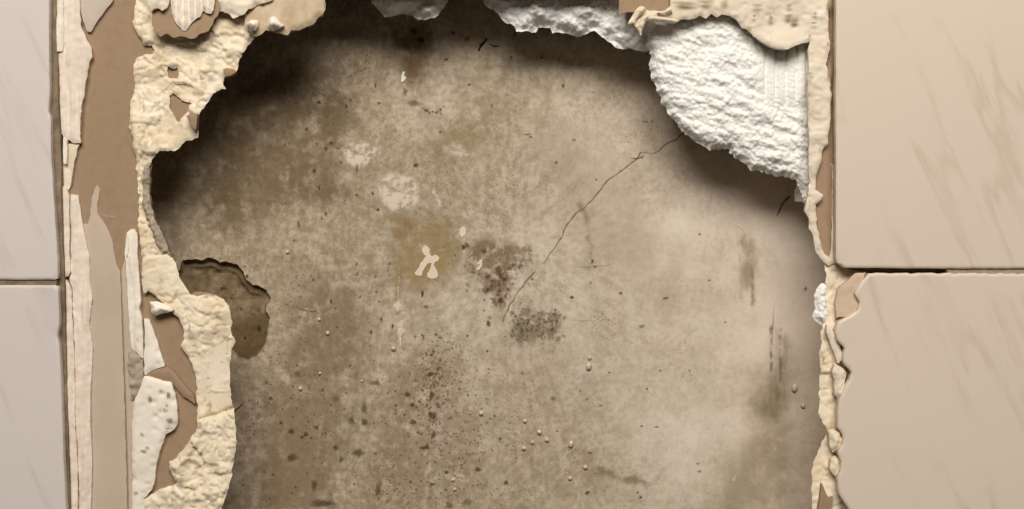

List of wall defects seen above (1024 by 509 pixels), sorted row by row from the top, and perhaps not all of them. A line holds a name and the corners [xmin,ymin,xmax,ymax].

spalling [83,0,326,509]
water stain [467,244,530,301]
crack [502,133,683,323]
peeling [628,0,866,509]